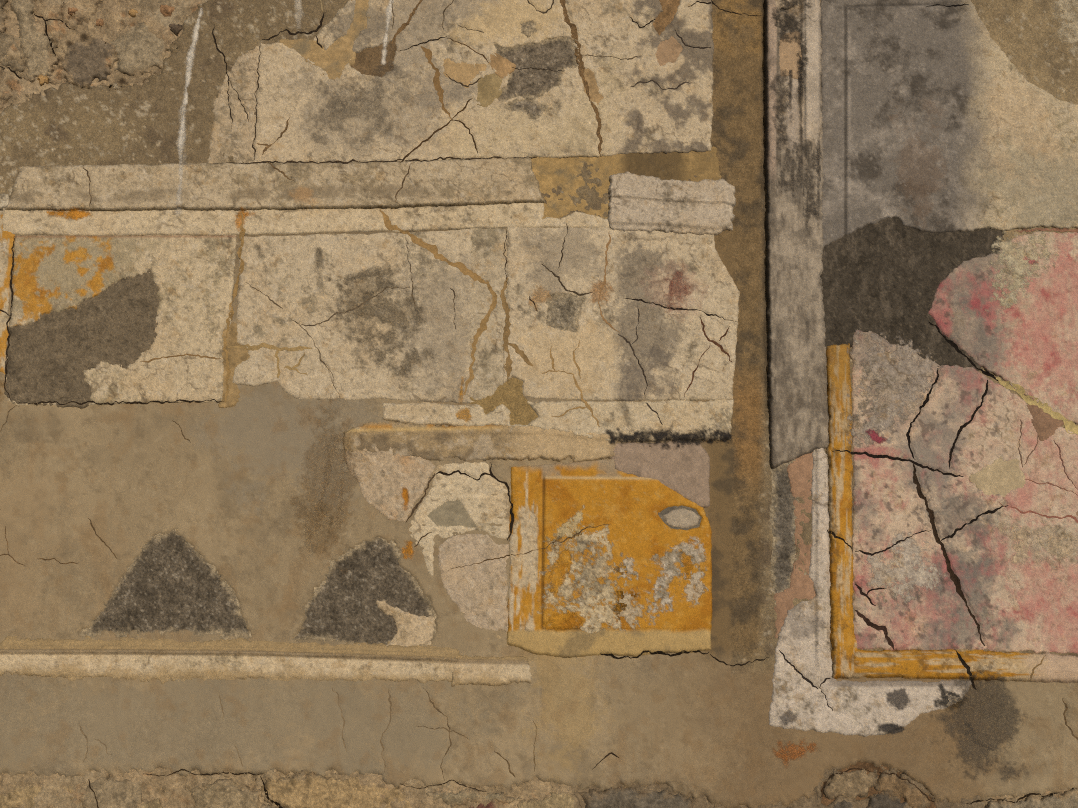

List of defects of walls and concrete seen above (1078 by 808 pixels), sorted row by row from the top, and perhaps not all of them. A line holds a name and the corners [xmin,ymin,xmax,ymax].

leakage [176,9,202,212]
flaking render [279,0,397,80]
crack [0,0,692,441]
leakage [382,0,394,64]
flaking render [443,21,604,120]
flaking render [531,147,721,219]
leakage [771,0,820,213]
flaking render [4,269,161,409]
crack [542,224,733,425]
flaking render [820,217,1058,447]
crack [827,322,1078,690]
spalling [1027,404,1064,441]